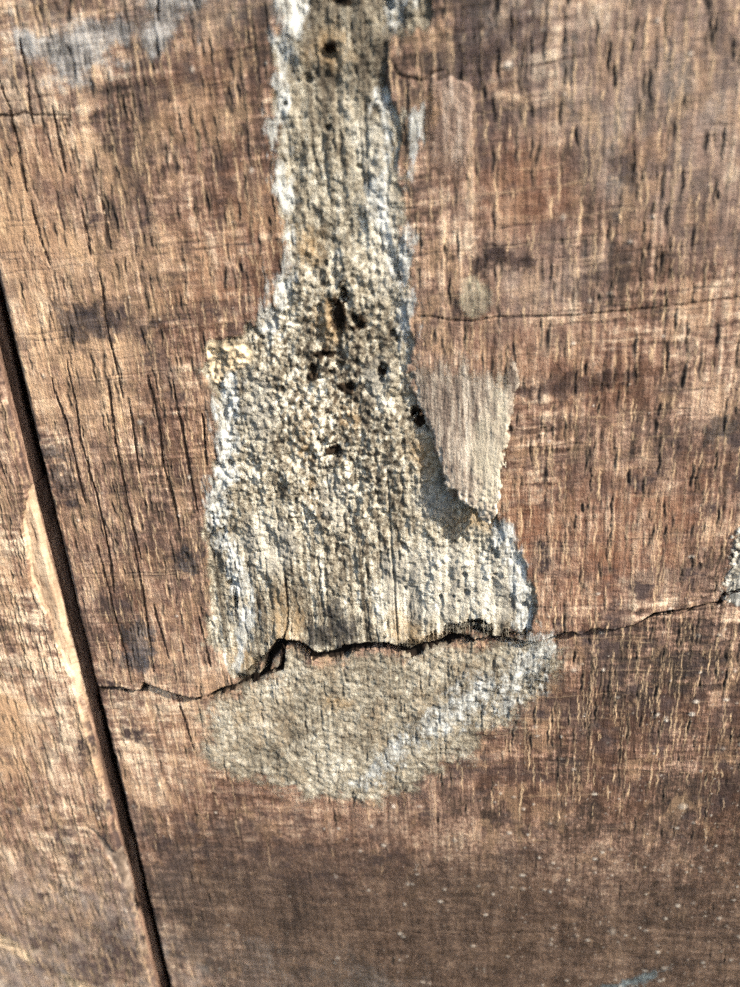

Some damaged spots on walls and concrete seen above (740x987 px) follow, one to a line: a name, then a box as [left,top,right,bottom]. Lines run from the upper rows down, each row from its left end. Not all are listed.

spalling [199,0,539,682]
crack [52,274,739,749]
leakage [720,528,740,606]